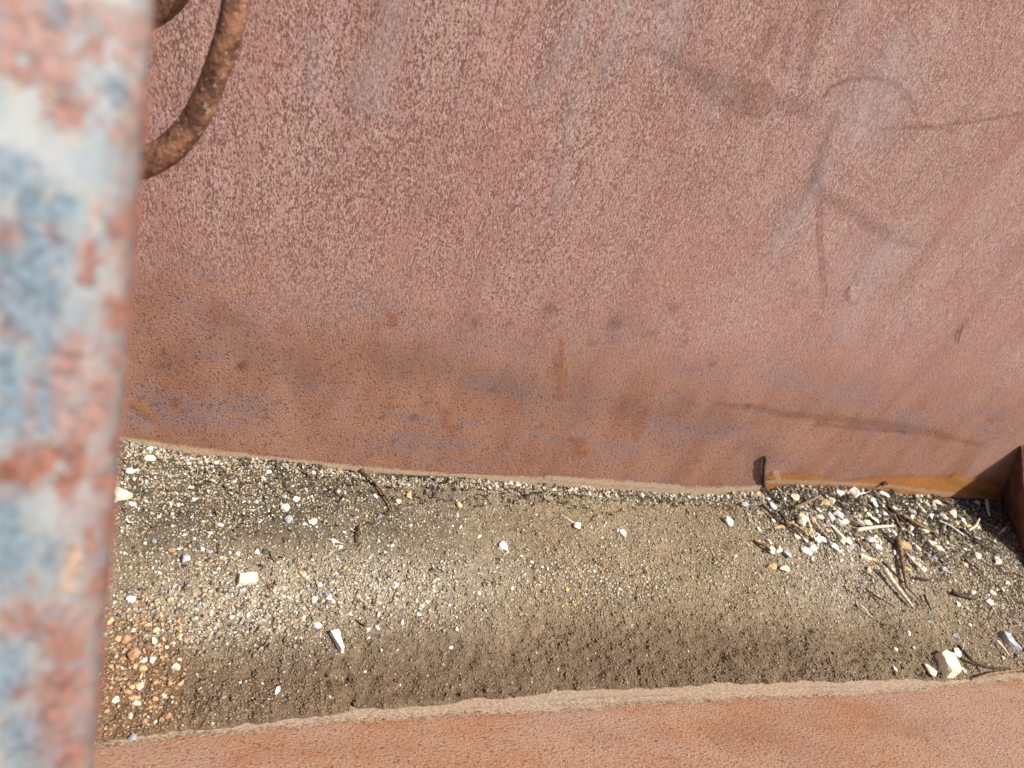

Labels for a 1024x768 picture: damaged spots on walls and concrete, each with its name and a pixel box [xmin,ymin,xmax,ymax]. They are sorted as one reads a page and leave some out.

corrosion [0,442,96,495]
corrosion [762,473,1003,502]